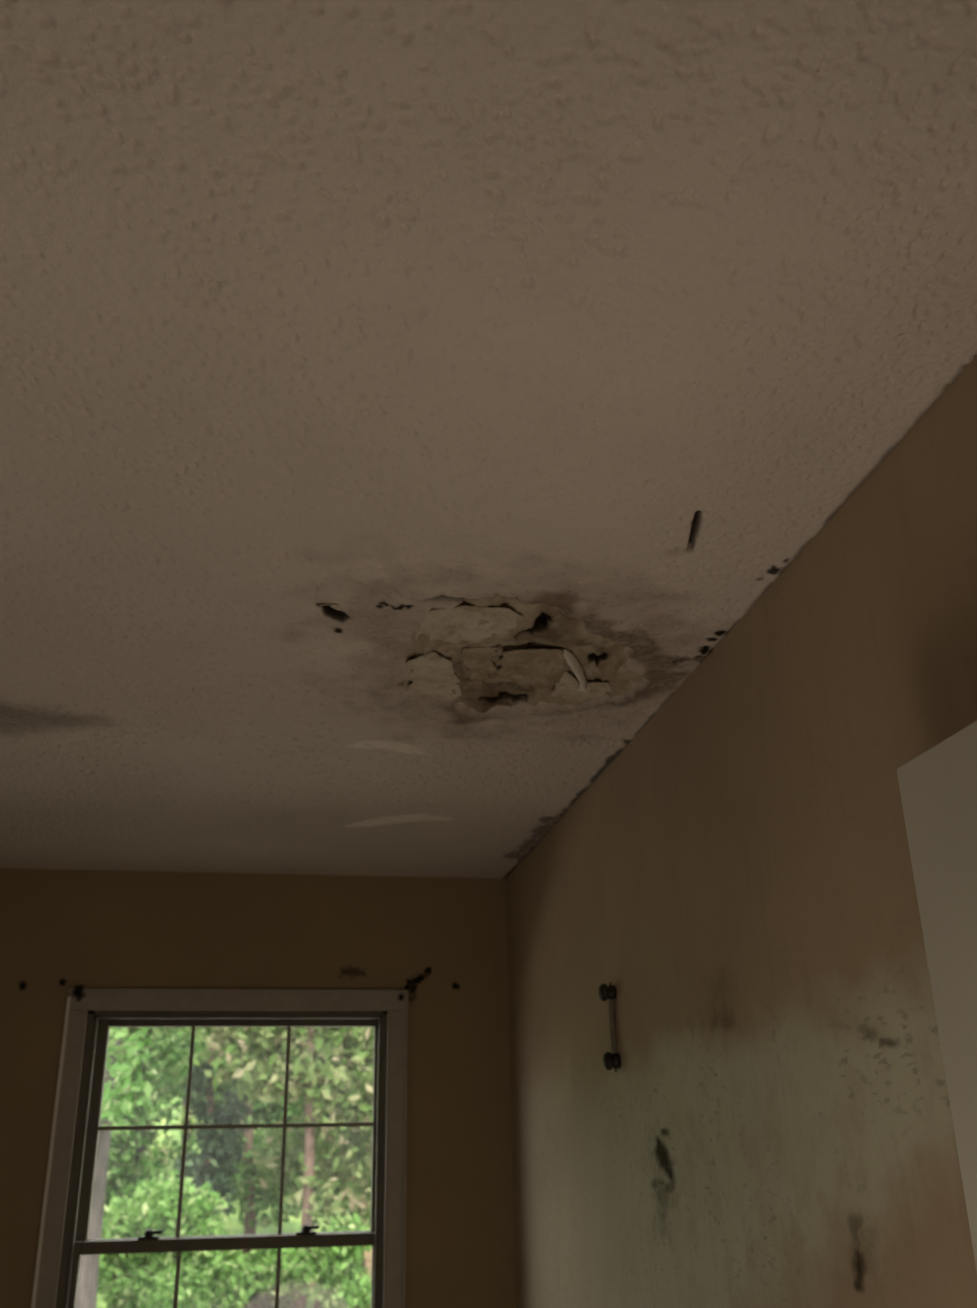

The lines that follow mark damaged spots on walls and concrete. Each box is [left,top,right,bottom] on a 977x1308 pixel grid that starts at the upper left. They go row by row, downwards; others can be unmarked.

peeling [317,603,349,633]